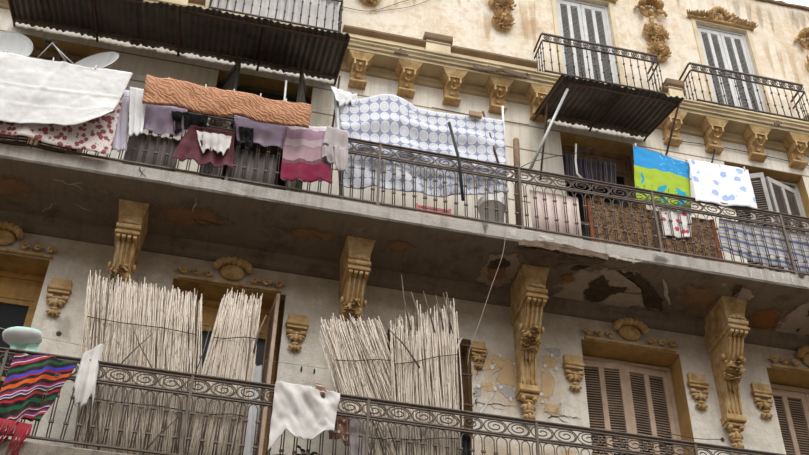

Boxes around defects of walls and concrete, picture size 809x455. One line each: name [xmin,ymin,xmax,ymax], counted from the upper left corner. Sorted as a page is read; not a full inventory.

peeling [475,239,663,311]
peeling [774,302,809,336]
peeling [471,354,517,401]
peeling [540,348,563,416]